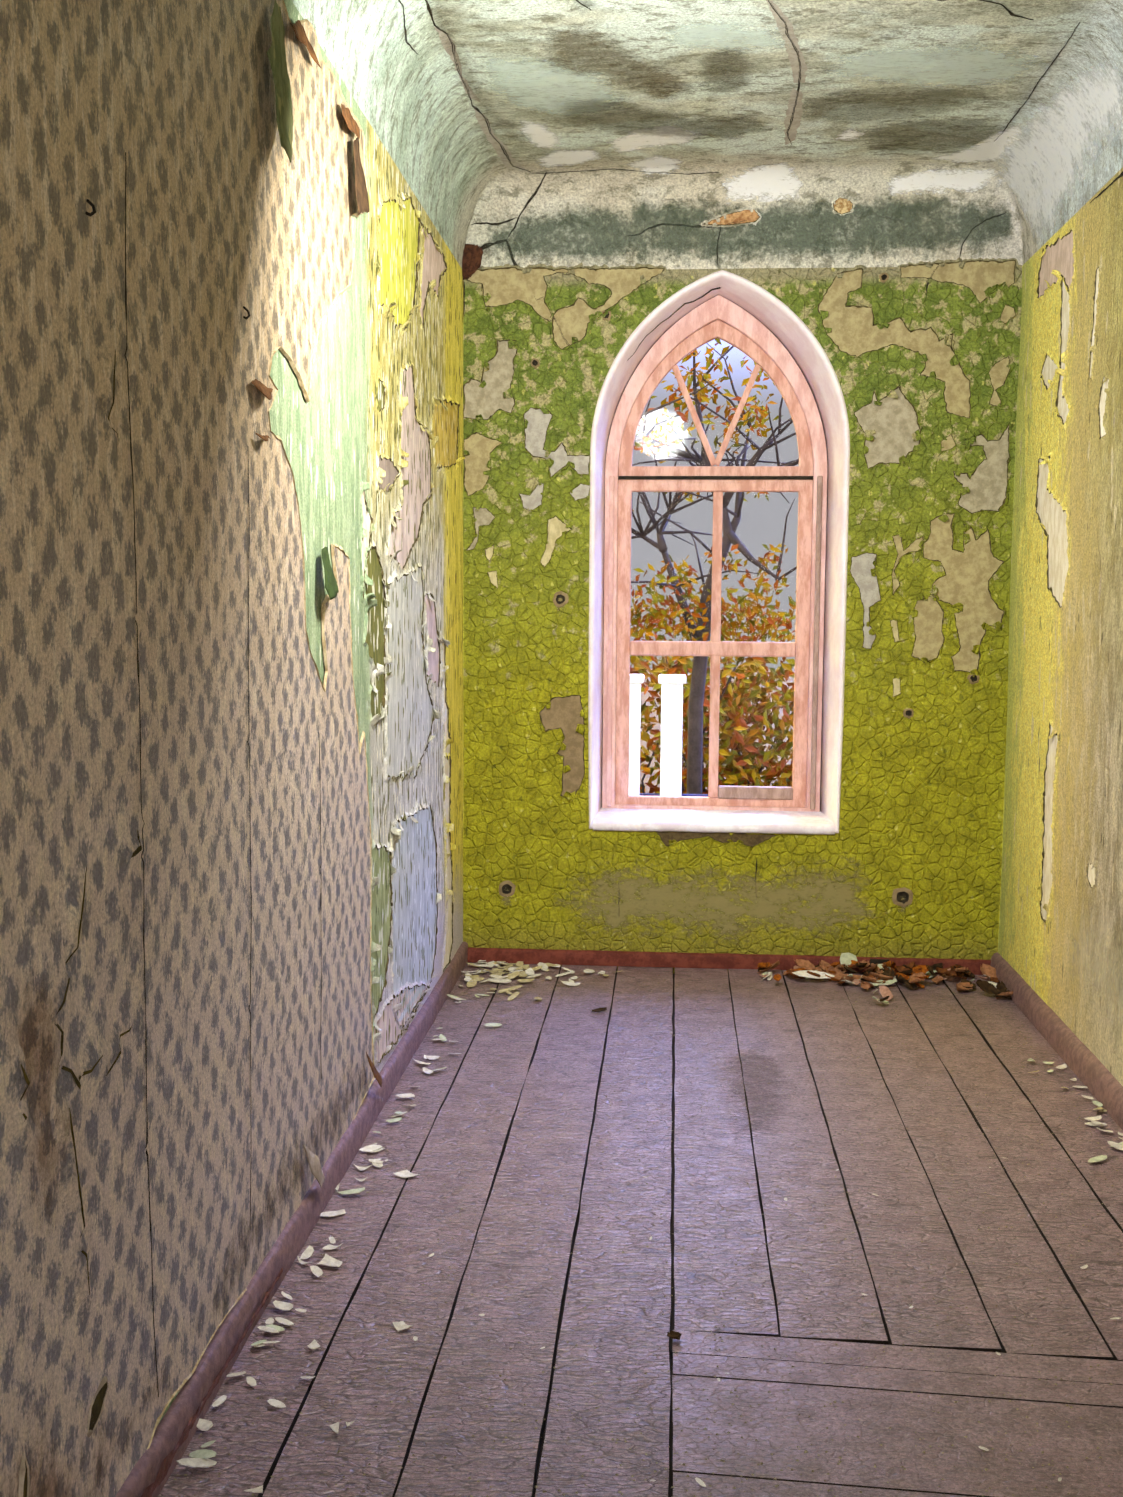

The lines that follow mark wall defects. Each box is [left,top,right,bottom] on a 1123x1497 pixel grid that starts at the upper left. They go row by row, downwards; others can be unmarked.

leakage [543,30,767,137]
crack [766,0,807,145]
crack [938,0,1033,20]
crack [996,22,1080,140]
crack [398,0,719,349]
crack [627,220,747,360]
leakage [488,196,1013,266]
peeling [1036,225,1076,430]
peeling [813,265,1012,677]
peeling [1035,450,1071,611]
flaking render [654,831,778,851]
peeling [1037,719,1060,925]